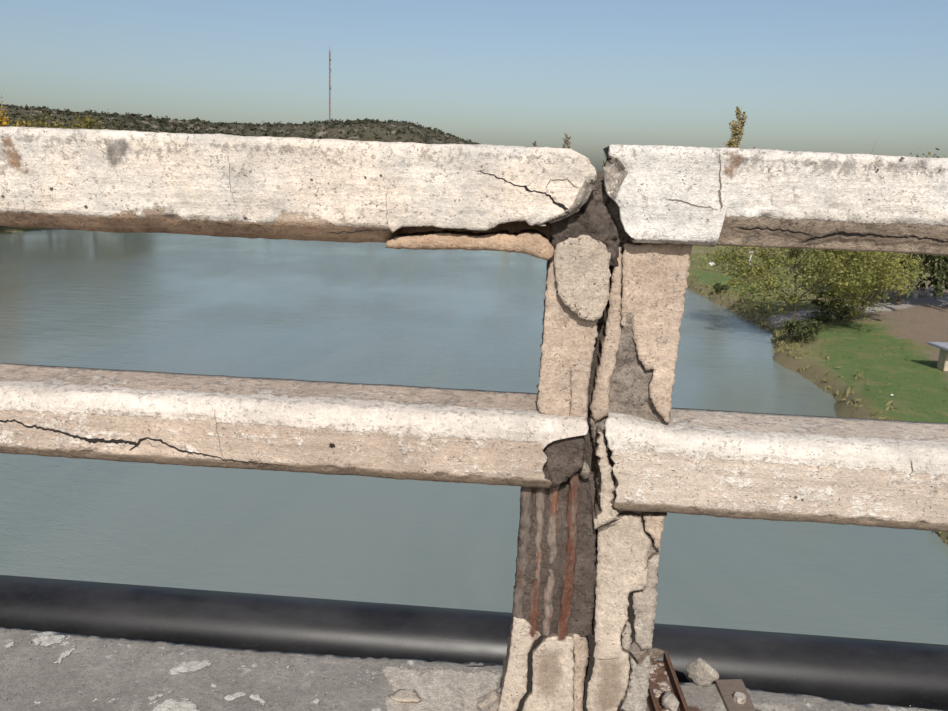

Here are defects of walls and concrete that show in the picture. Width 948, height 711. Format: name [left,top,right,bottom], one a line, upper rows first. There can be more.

crack [480,171,577,215]
crack [662,154,723,211]
spalling [385,158,628,322]
crack [737,227,948,243]
spalling [604,314,669,424]
crack [0,406,292,467]
spalling [512,435,597,638]
corrosion [530,579,539,637]
crack [583,592,638,711]
peeling [148,691,200,711]
peeling [372,665,501,711]
corrosion [649,659,701,711]